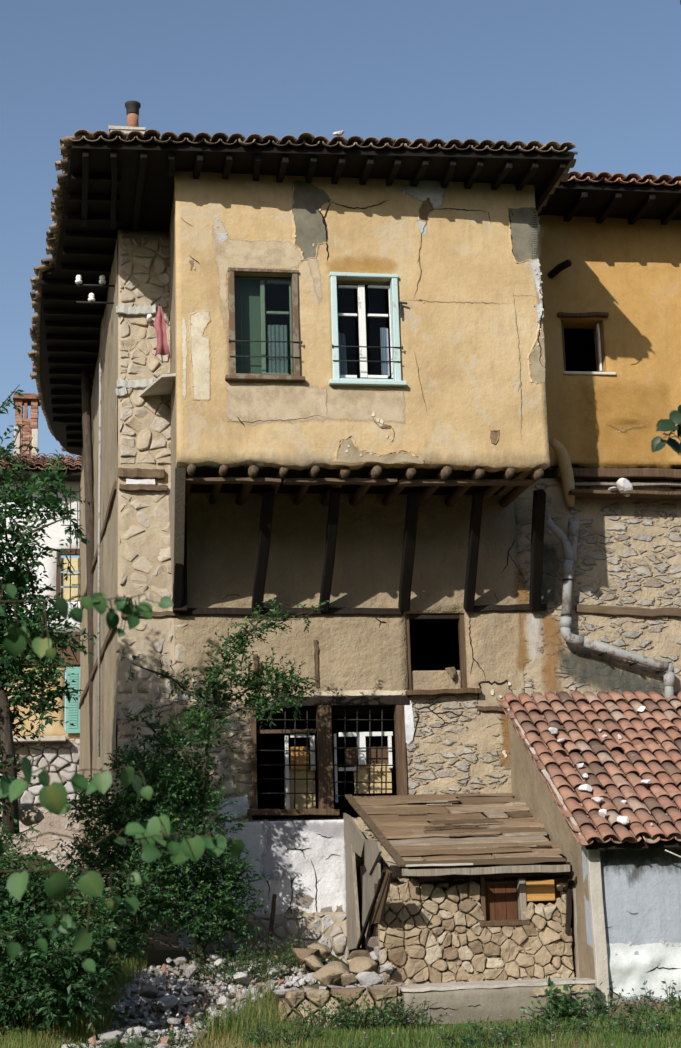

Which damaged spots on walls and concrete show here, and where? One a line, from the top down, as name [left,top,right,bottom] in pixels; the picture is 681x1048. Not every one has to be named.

peeling [181,180,331,401]
crack [318,200,388,260]
peeling [398,180,445,235]
crack [413,208,536,427]
peeling [506,205,545,384]
peeling [226,381,425,464]